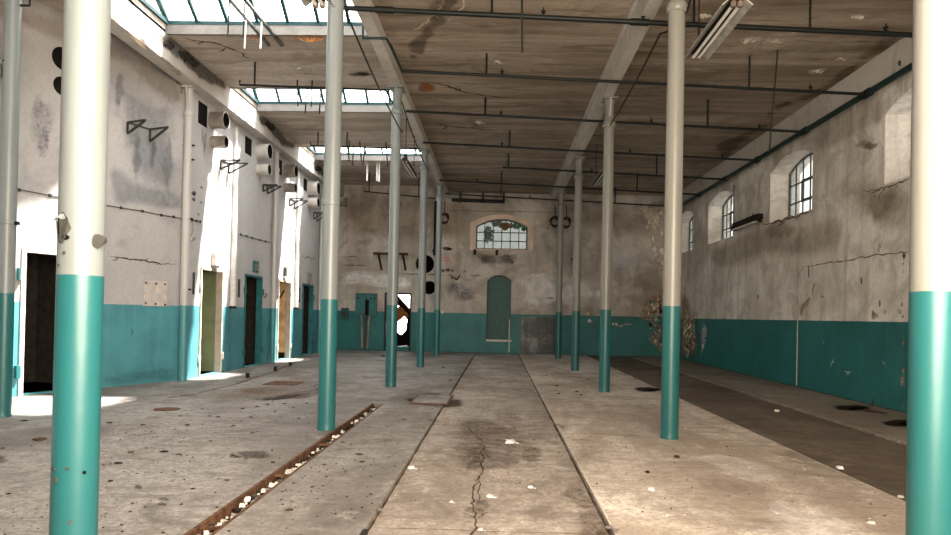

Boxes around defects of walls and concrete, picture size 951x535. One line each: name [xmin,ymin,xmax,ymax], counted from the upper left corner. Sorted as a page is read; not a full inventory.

crack [110,256,171,265]
crack [796,251,909,305]
flaking render [640,291,663,350]
peeling [681,296,707,357]
crack [460,423,490,535]